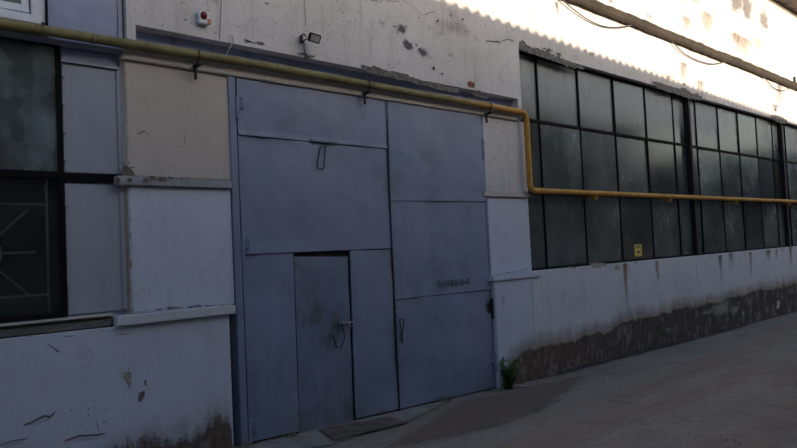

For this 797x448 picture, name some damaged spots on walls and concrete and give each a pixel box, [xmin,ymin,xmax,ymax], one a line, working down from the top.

leakage [732,0,752,19]
peeling [115,162,174,183]
leakage [509,280,797,385]
leakage [116,415,233,448]